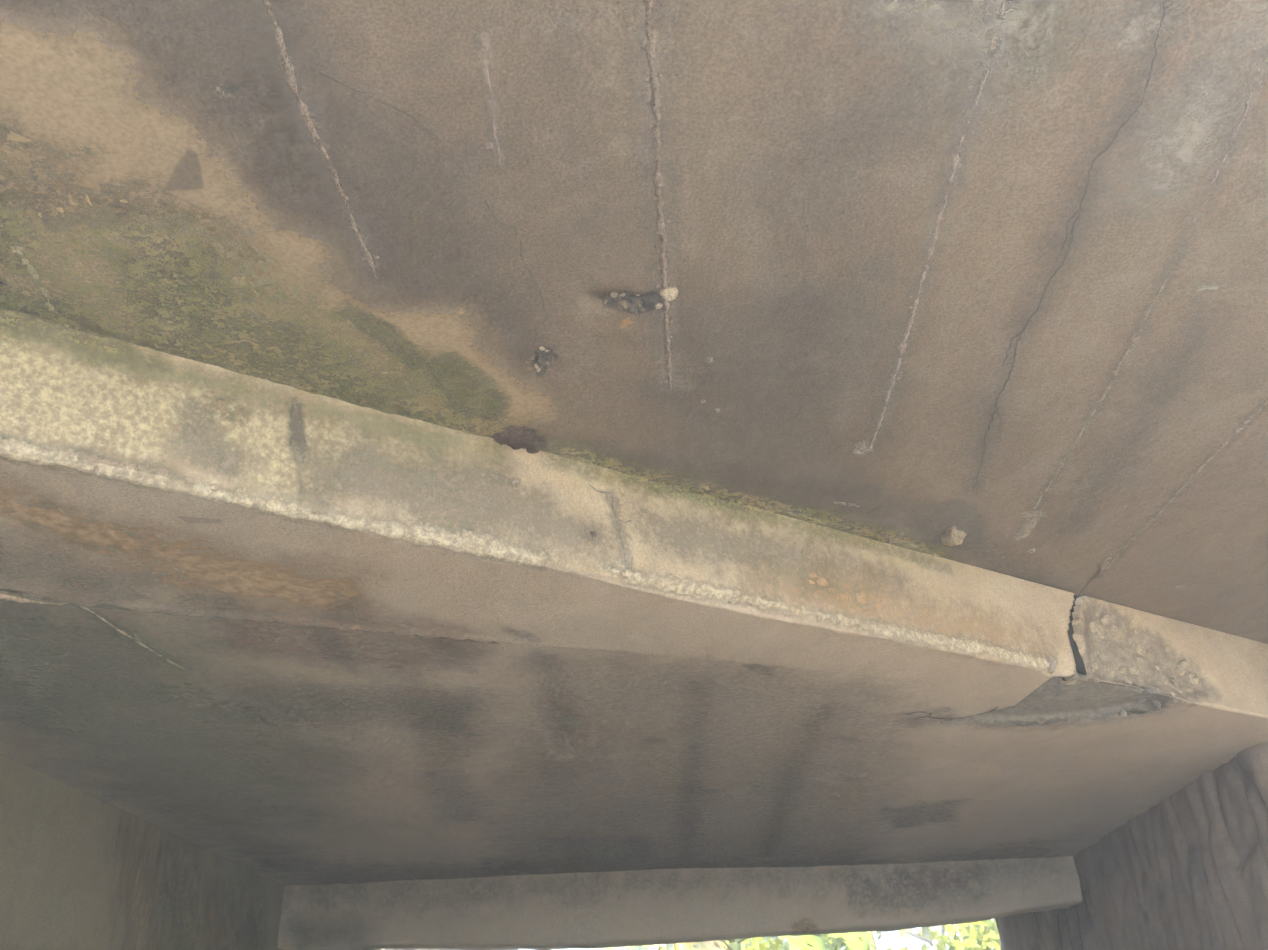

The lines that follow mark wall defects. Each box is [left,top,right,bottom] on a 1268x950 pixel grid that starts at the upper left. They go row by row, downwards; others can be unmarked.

peeling [0,20,556,438]
spalling [598,291,663,315]
crack [973,0,1165,491]
damp [0,325,478,496]
spalling [0,431,548,567]
crack [1062,553,1116,680]